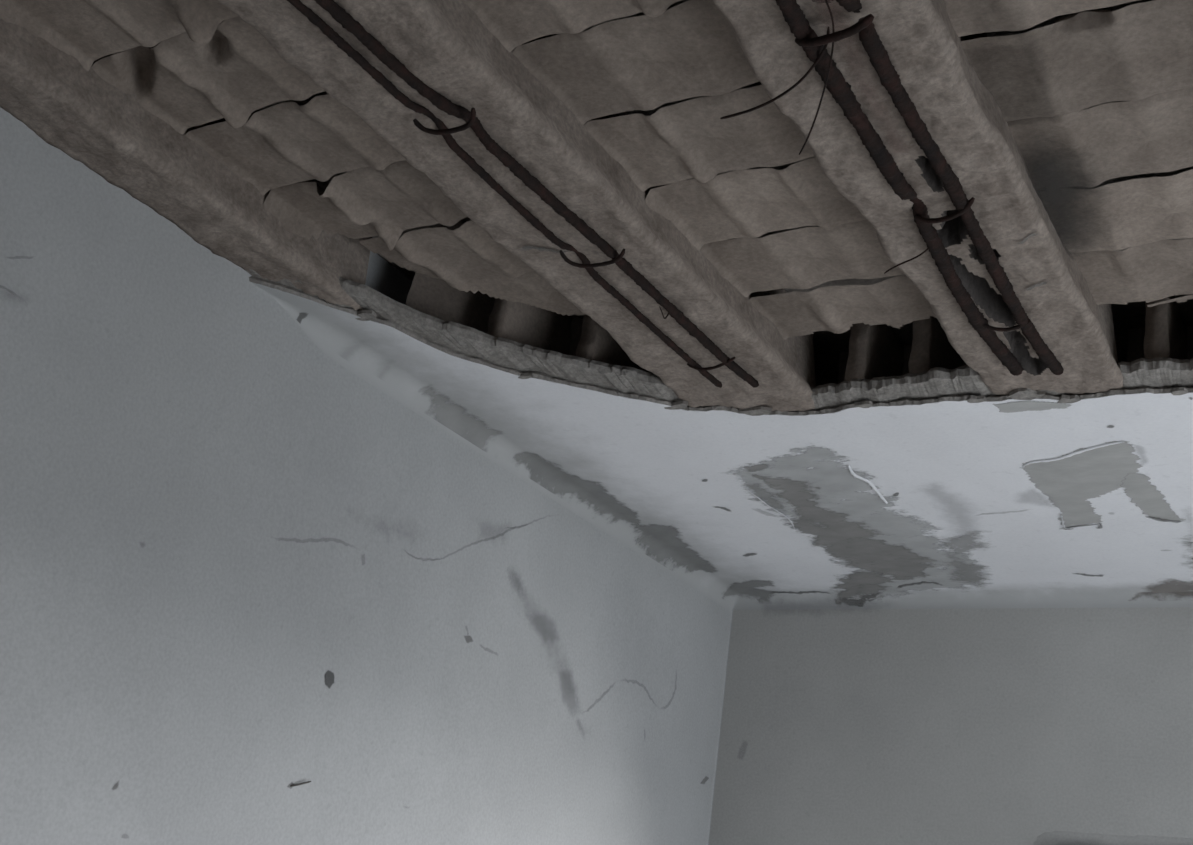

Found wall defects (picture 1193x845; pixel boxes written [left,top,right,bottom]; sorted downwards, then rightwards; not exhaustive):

spalling [915,156,945,193]
flaking render [245,210,1193,416]
peeling [734,446,985,603]
peeling [1022,425,1185,530]